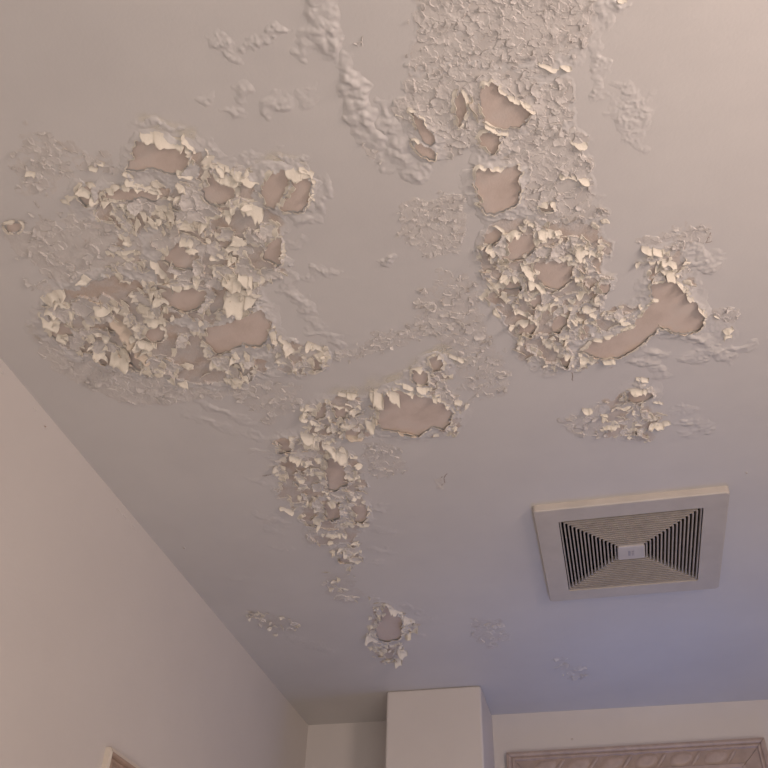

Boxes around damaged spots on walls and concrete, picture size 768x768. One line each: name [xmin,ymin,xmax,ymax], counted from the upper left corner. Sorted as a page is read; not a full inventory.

peeling [1,128,333,408]
peeling [388,0,741,379]
peeling [262,351,474,574]
peeling [555,376,672,443]
peeling [360,592,422,669]